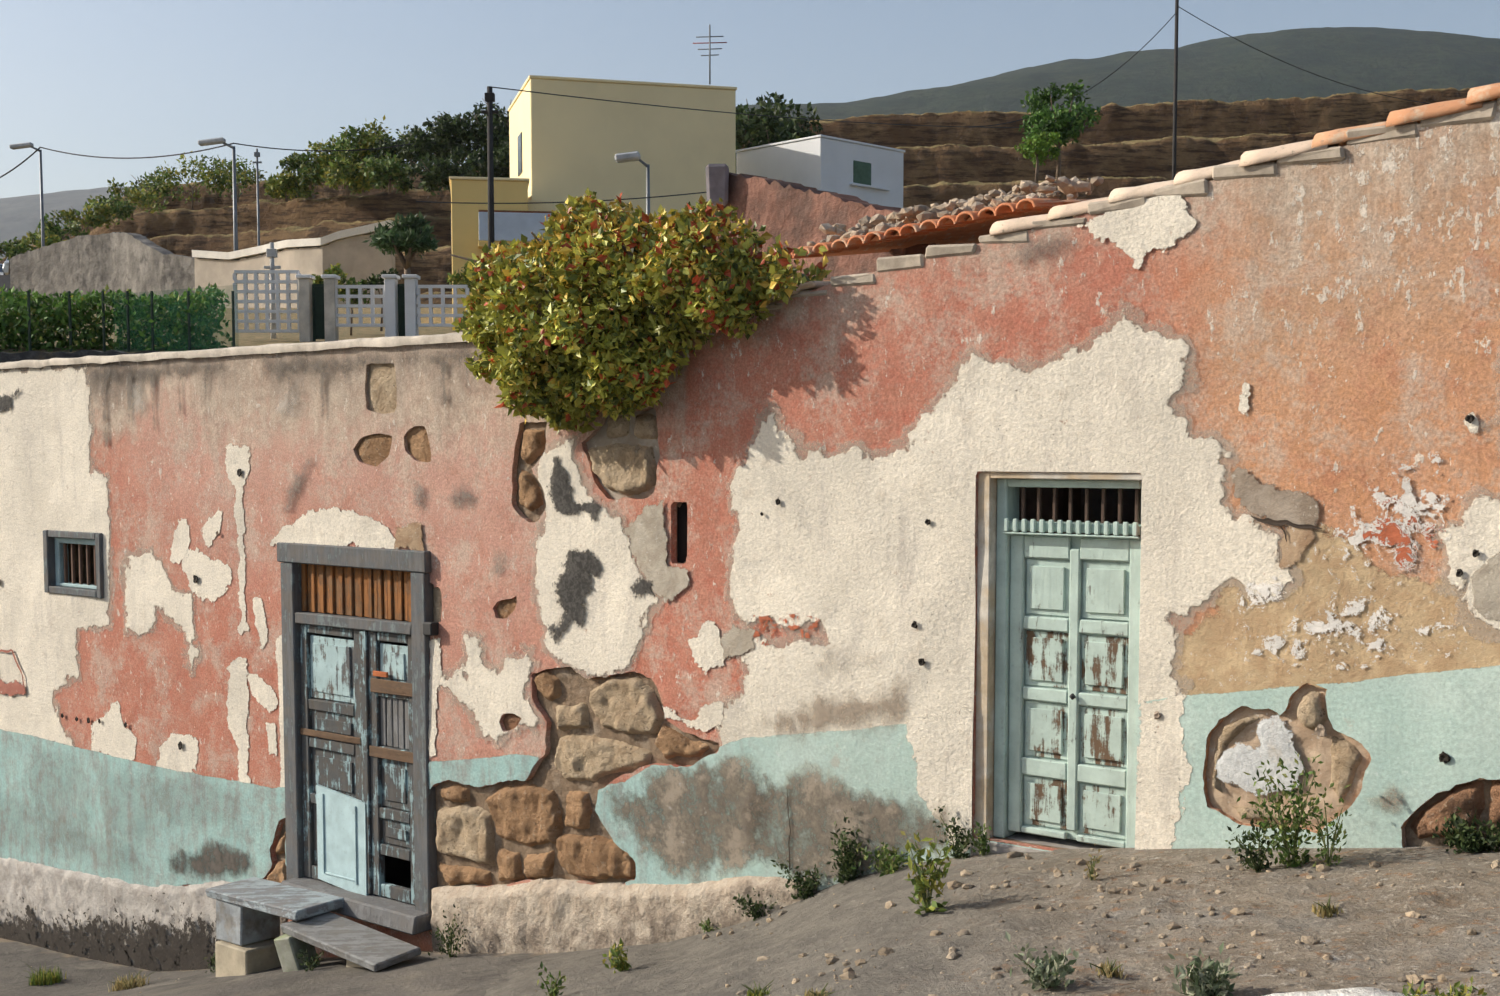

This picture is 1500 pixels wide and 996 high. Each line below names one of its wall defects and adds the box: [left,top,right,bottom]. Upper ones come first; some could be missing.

peeling [1077,195,1197,270]
spalling [368,363,397,414]
spalling [356,426,431,467]
peeling [270,506,398,549]
peeling [0,364,285,787]
peeling [428,308,1500,887]
damp [613,756,948,885]
damp [0,891,220,972]